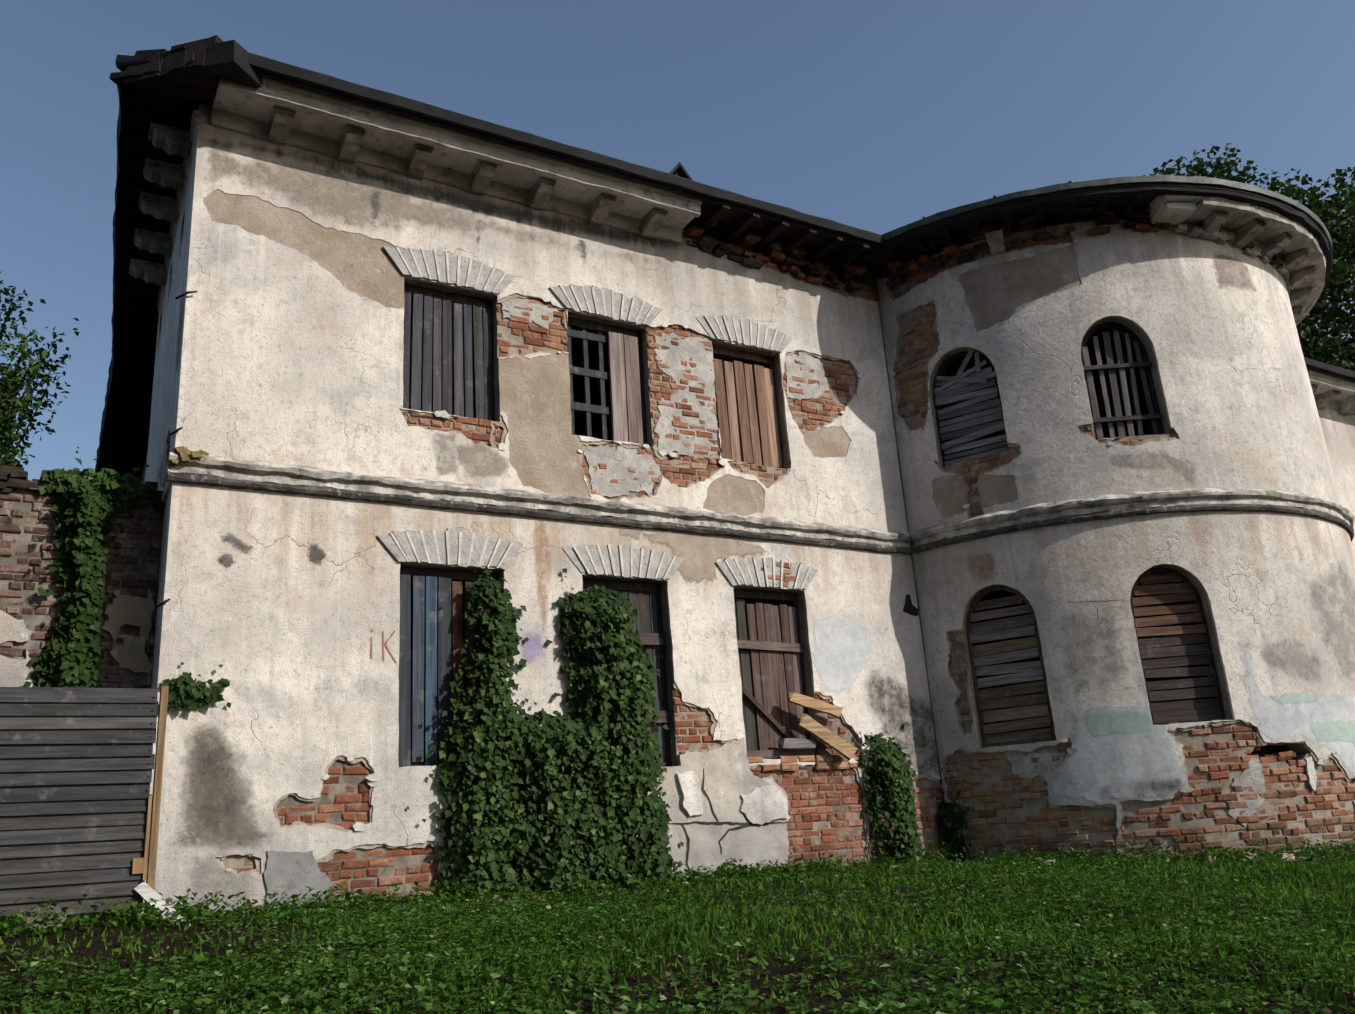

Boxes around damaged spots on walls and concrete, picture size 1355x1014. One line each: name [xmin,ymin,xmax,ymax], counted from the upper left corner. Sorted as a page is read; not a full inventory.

peeling [203,154,510,309]
flaking render [158,432,171,485]
peeling [400,293,791,516]
flaking render [770,350,864,458]
peeling [682,228,1082,432]
water stain [182,729,265,908]
flaking render [273,753,447,906]
flaking render [672,680,737,765]
crack [669,769,787,877]
water stain [869,676,939,775]
flaking render [750,629,1355,870]